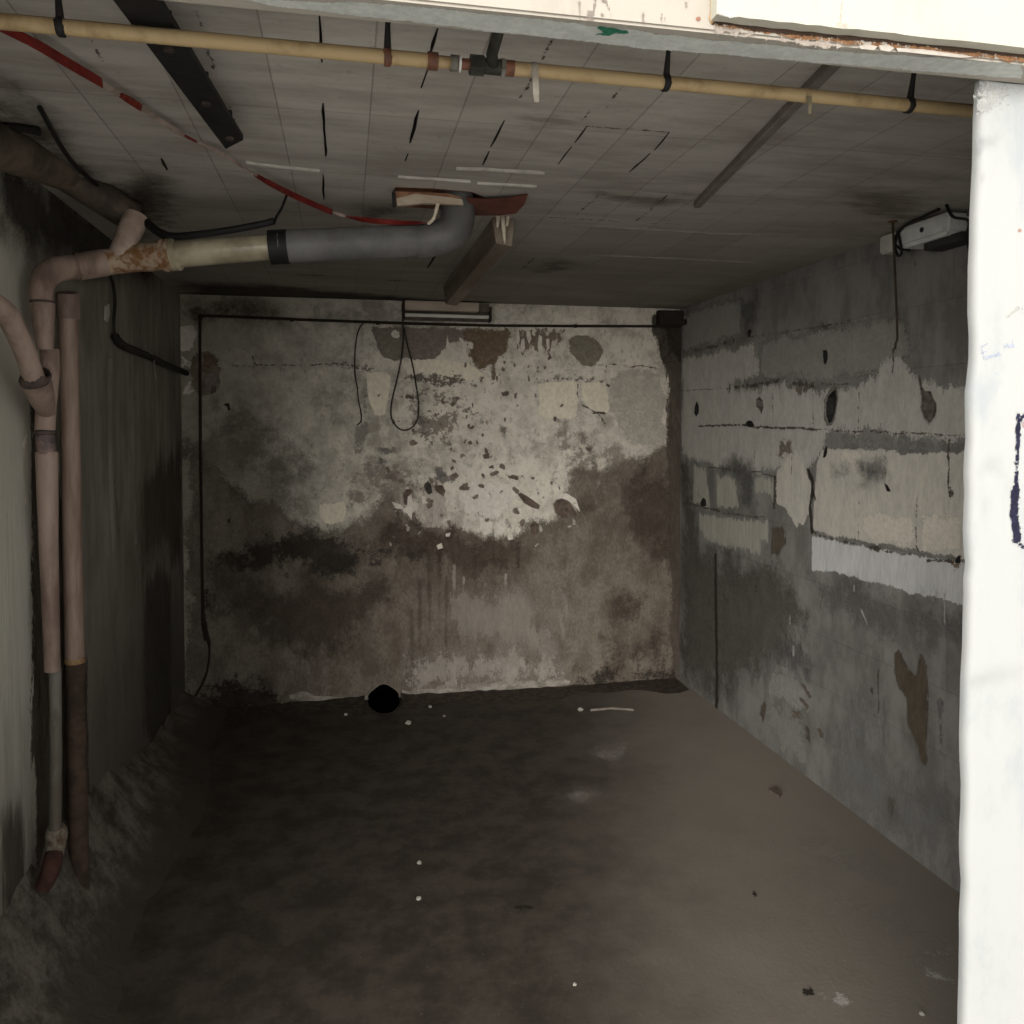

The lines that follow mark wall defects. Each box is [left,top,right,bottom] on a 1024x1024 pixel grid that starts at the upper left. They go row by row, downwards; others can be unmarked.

peeling [712,11,844,49]
peeling [858,44,972,58]
peeling [371,326,487,362]
peeling [484,327,565,406]
spalling [745,397,764,428]
spalling [824,386,838,426]
spalling [918,375,937,425]
peeling [386,392,543,549]
damp [141,315,808,743]
flaking render [550,481,580,530]
peeling [775,448,812,527]
damp [894,650,944,766]